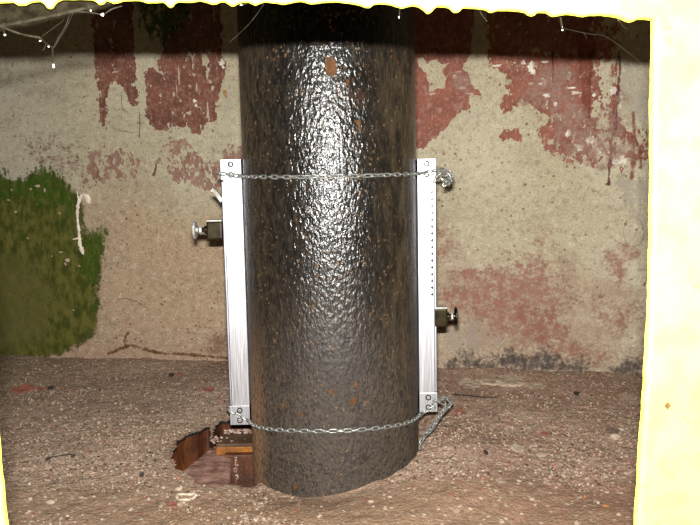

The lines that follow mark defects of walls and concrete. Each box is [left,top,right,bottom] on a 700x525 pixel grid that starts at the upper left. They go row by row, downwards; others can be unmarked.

peeling [90,1,242,194]
corrosion [324,56,337,76]
peeling [415,7,481,150]
peeling [485,11,649,179]
leakage [440,257,603,372]
leakage [610,357,643,375]